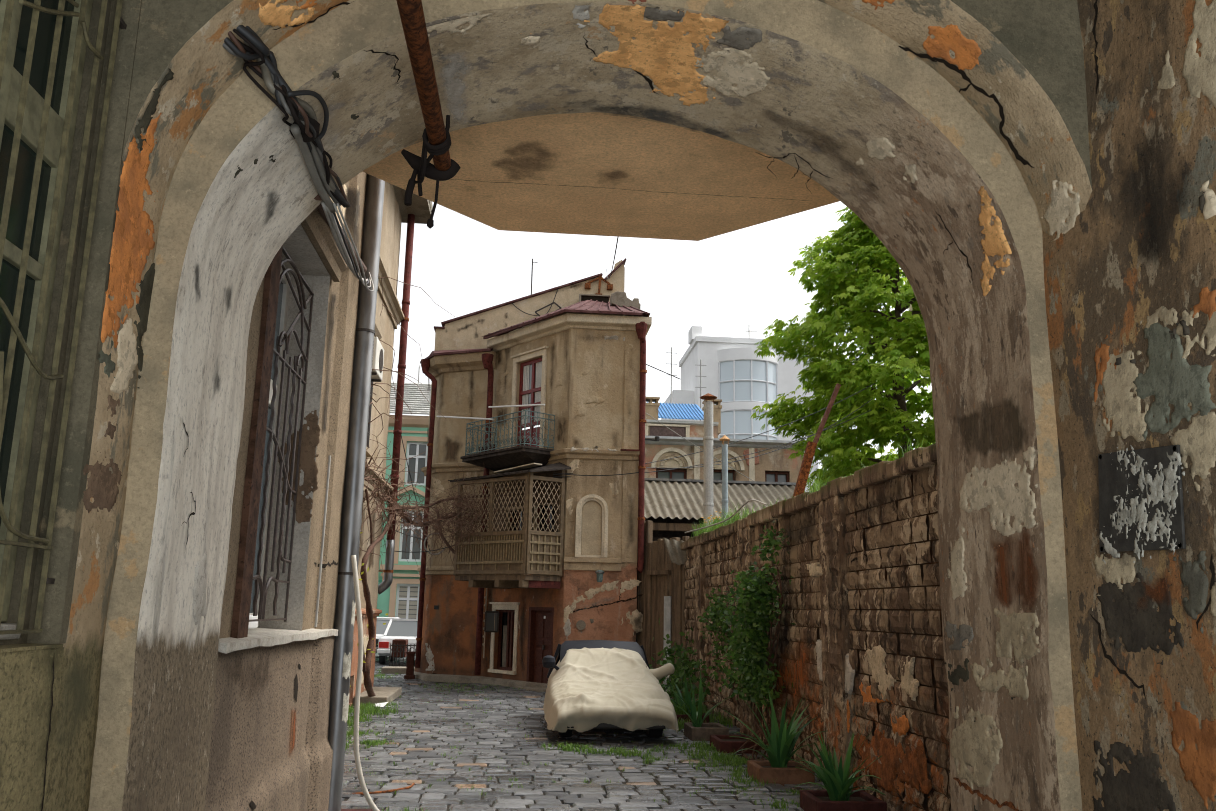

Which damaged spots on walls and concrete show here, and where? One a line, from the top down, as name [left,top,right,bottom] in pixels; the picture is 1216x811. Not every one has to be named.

peeling [572,0,770,107]
peeling [923,24,982,70]
crack [898,46,1034,168]
peeling [1157,0,1216,107]
crack [451,152,833,201]
peeling [98,68,174,439]
peeling [978,186,1012,296]
peeling [1094,287,1216,491]
peeling [83,451,122,513]
crack [573,588,643,612]
peeling [1092,551,1216,665]
peeling [1093,740,1176,811]